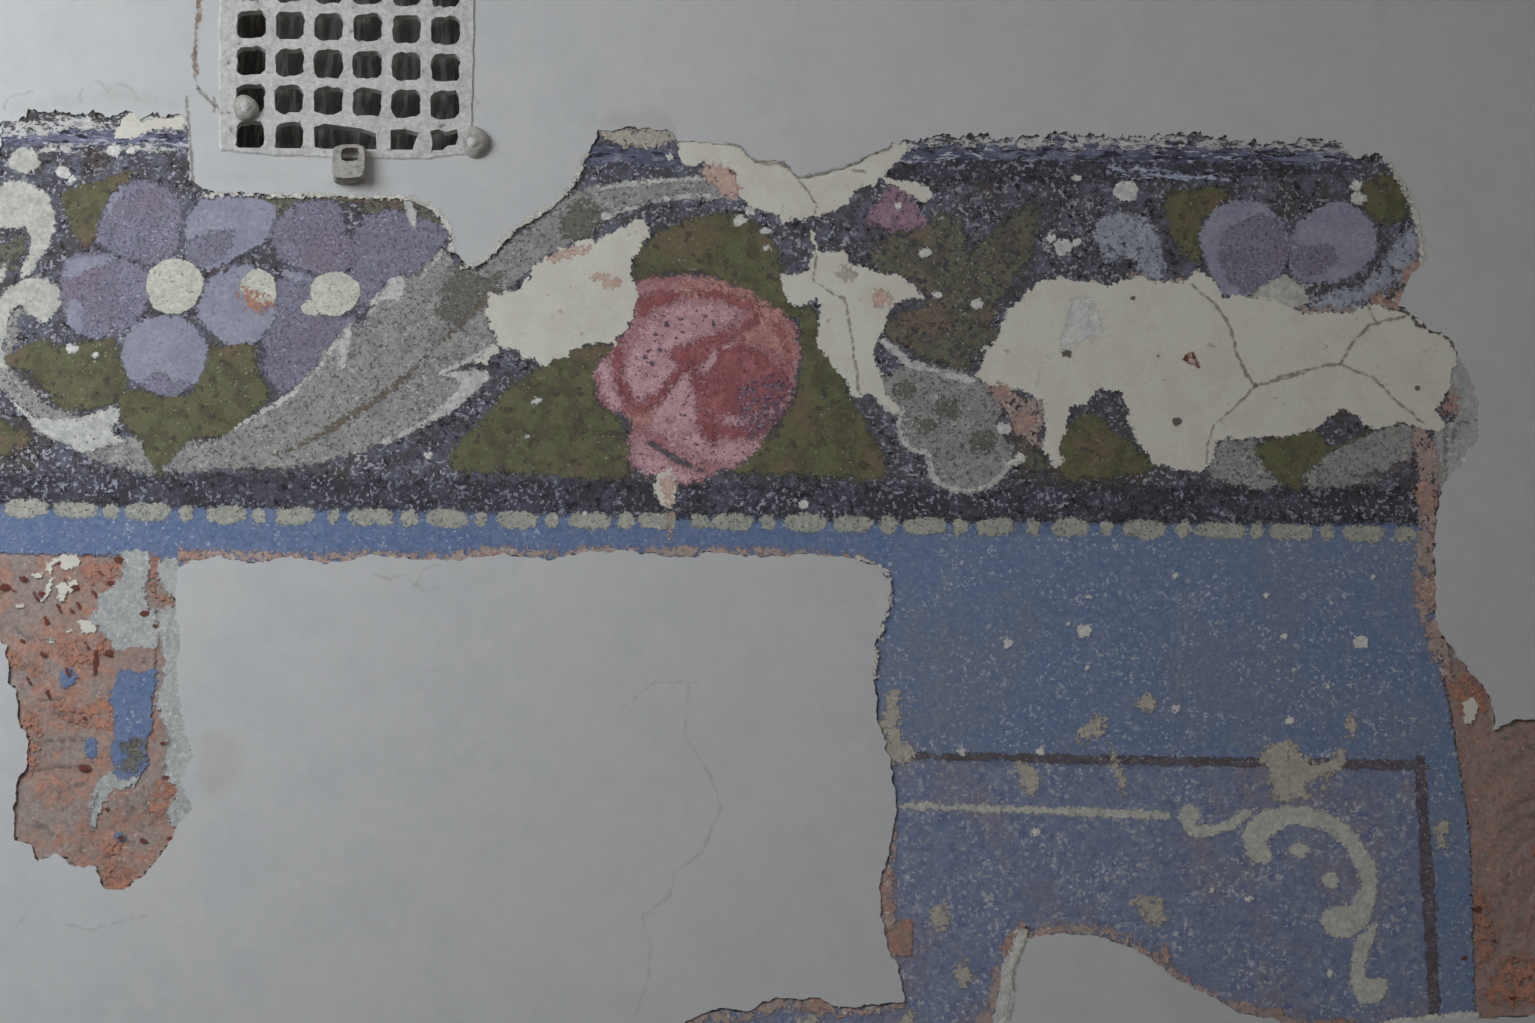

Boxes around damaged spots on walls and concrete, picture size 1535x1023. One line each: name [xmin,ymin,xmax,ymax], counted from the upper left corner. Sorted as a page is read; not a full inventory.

crack [1192,284,1458,445]